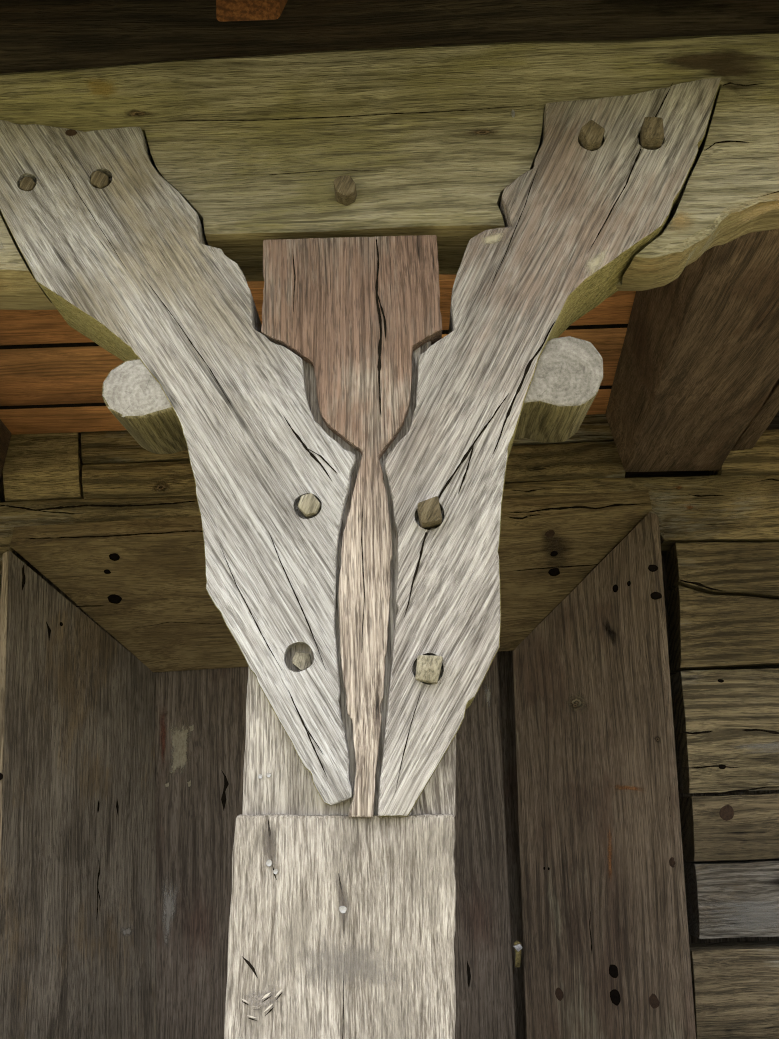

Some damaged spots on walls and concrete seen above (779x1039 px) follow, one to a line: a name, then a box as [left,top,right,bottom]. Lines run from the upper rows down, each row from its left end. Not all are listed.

crack [375,239,387,414]
crack [284,417,337,481]
crack [678,579,722,591]